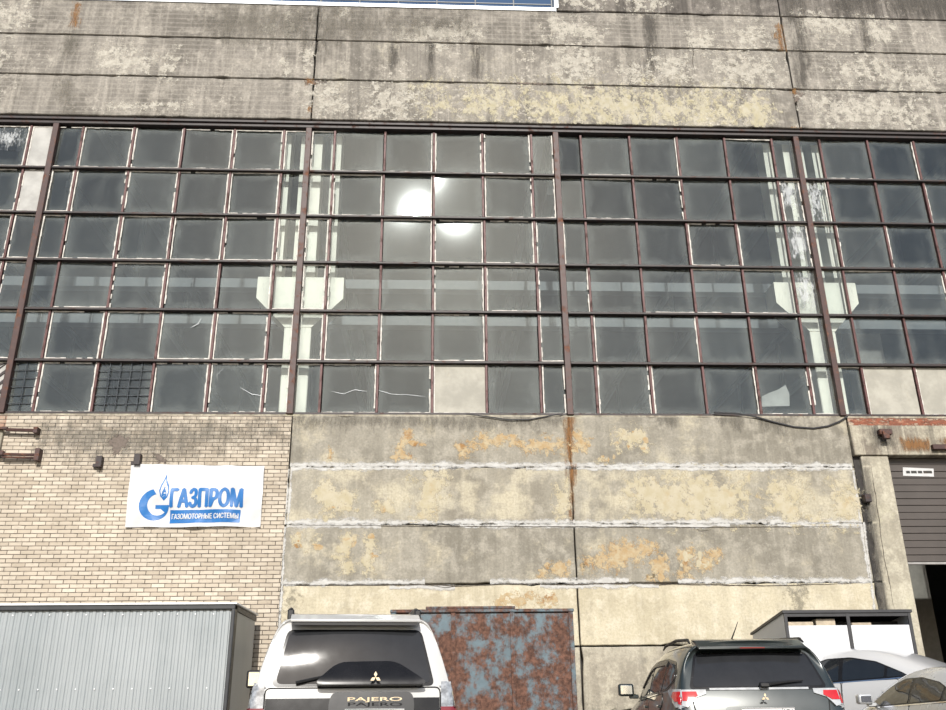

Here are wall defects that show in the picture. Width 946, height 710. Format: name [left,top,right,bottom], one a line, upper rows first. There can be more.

peeling [311,478,359,522]
peeling [389,428,453,526]
rust [563,417,577,521]
peeling [454,425,864,582]
peeling [290,531,381,576]
peeling [494,591,558,609]